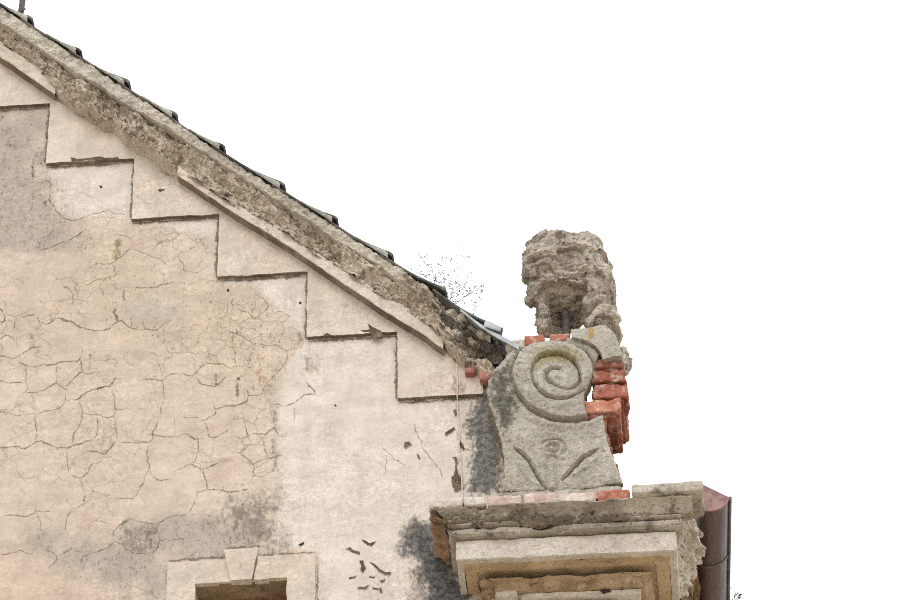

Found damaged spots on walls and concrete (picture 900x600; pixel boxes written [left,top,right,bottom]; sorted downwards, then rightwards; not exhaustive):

spalling [0,26,505,387]
crack [0,180,315,567]
spalling [346,539,392,593]
water stain [399,519,472,600]
flaking render [670,519,706,600]